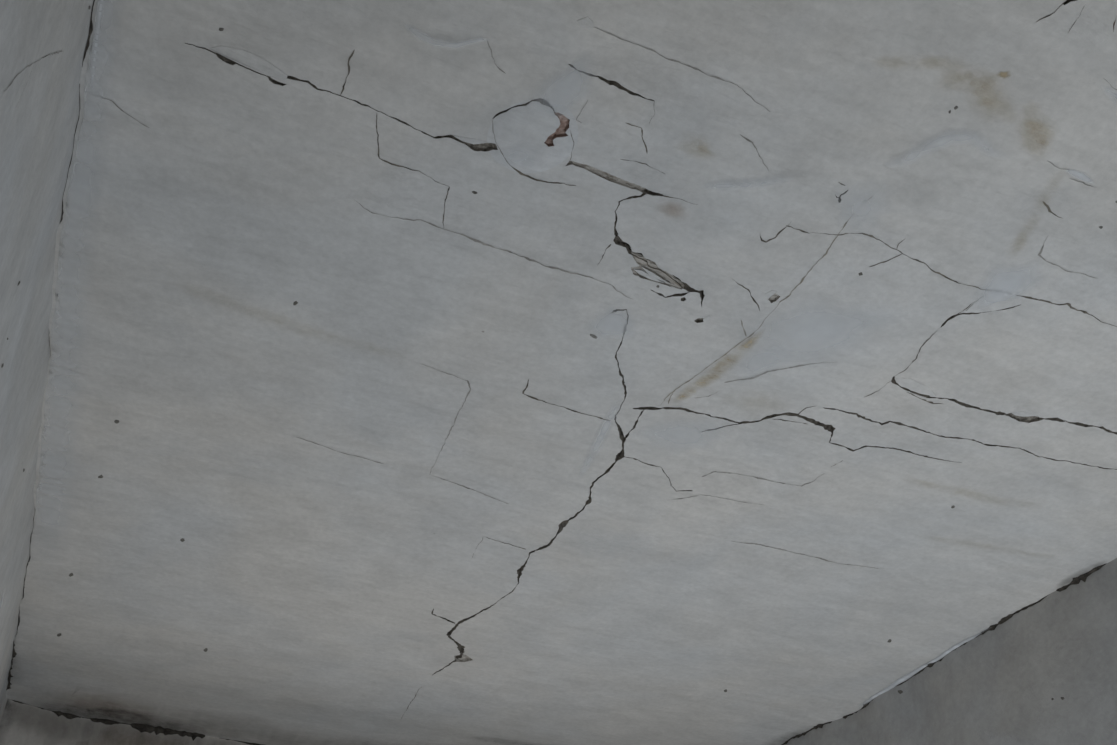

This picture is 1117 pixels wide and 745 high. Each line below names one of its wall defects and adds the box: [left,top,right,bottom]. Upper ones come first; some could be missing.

crack [5,0,149,223]
spalling [544,111,570,147]
crack [577,17,770,112]
crack [186,43,1117,674]
crack [6,514,263,745]
crack [782,563,1107,745]